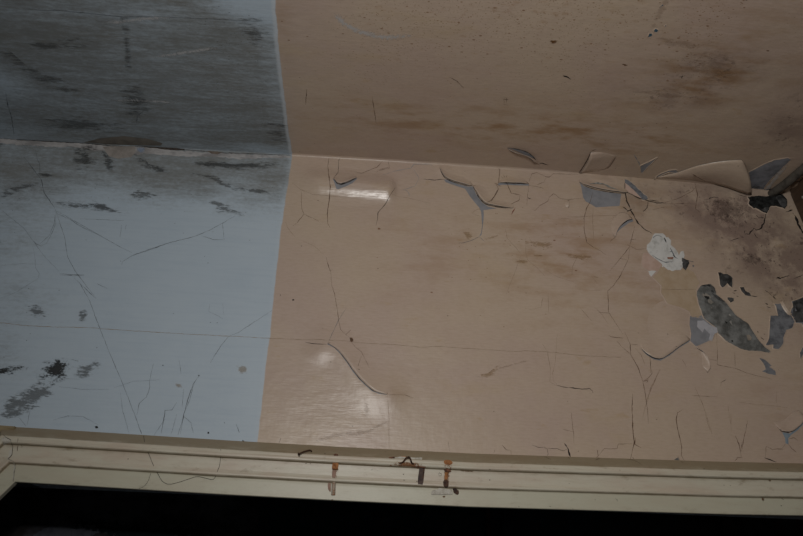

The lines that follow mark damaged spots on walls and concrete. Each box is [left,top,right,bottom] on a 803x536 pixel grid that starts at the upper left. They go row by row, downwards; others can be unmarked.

peeling [579,152,648,237]
peeling [654,157,792,214]
crack [0,138,702,463]
flaking render [641,252,803,376]